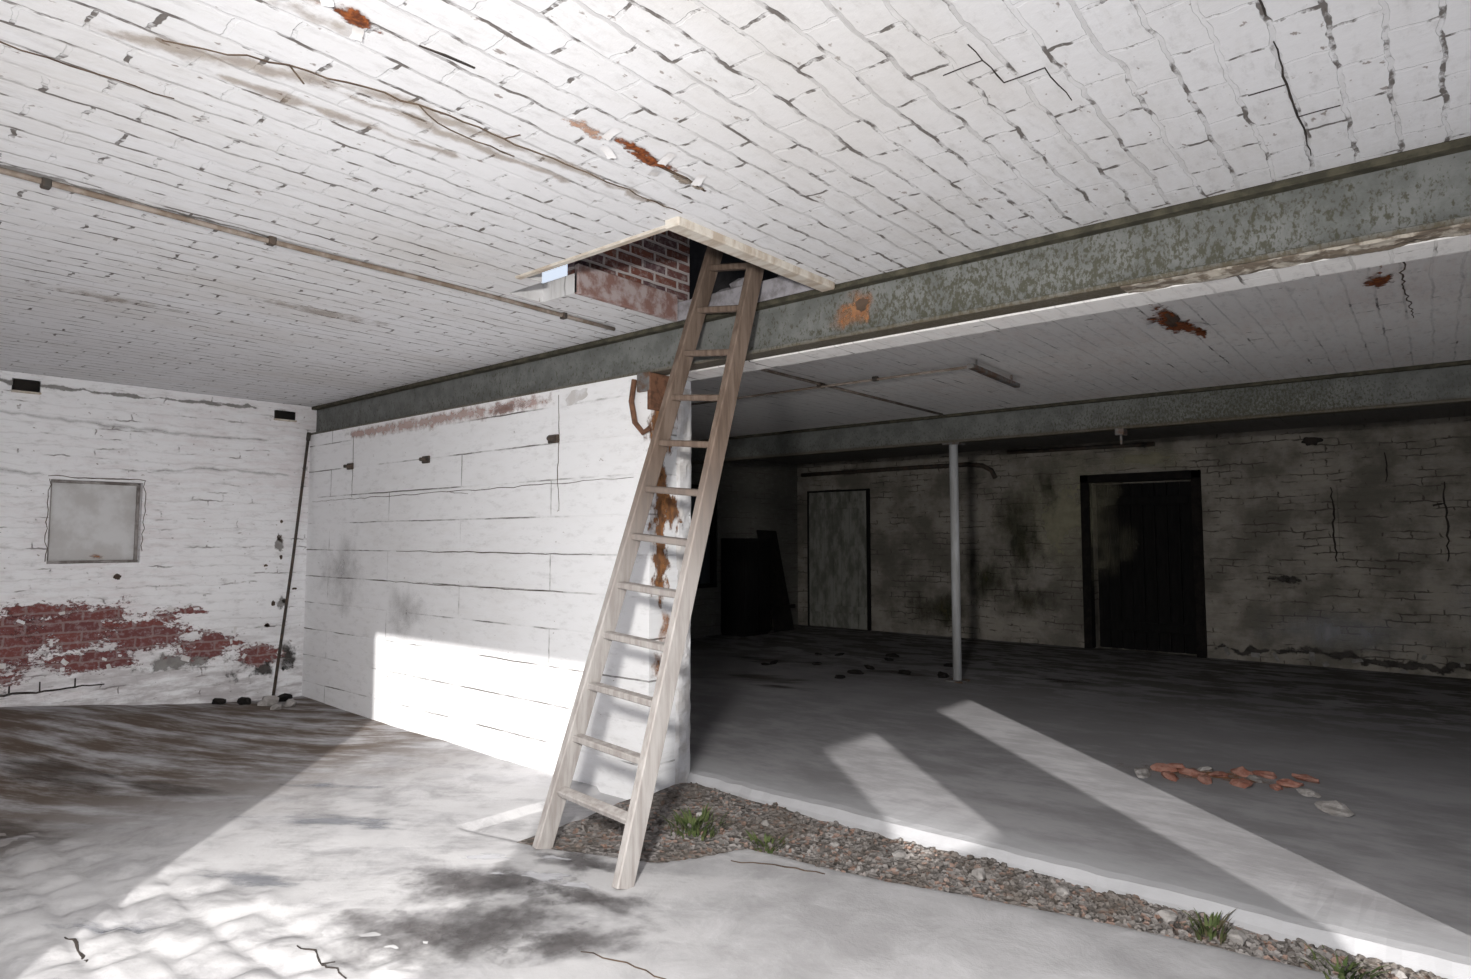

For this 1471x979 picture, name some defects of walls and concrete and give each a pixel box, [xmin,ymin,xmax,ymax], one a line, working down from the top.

crack [1248,0,1341,156]
rust [838,293,870,329]
rust [644,410,683,674]
peeling [0,574,297,688]
crack [64,937,88,962]
crack [297,945,346,979]